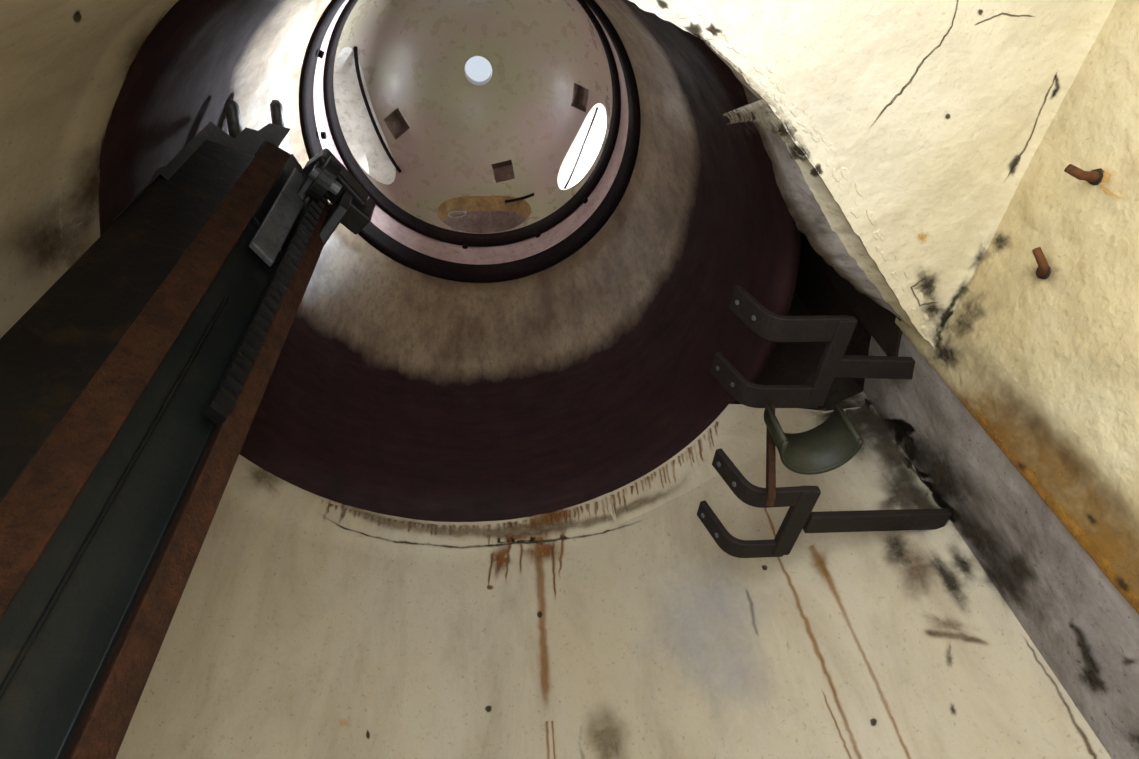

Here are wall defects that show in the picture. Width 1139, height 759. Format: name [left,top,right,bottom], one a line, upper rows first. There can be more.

crack [874,0,1034,123]
crack [1008,73,1060,176]
leakage [911,275,980,363]
mould [820,381,970,509]
leakage [957,397,1139,614]
corrosion [487,422,718,696]
mould [889,537,971,599]
mould [927,631,982,642]
mould [1070,623,1104,690]
leakage [593,725,620,759]